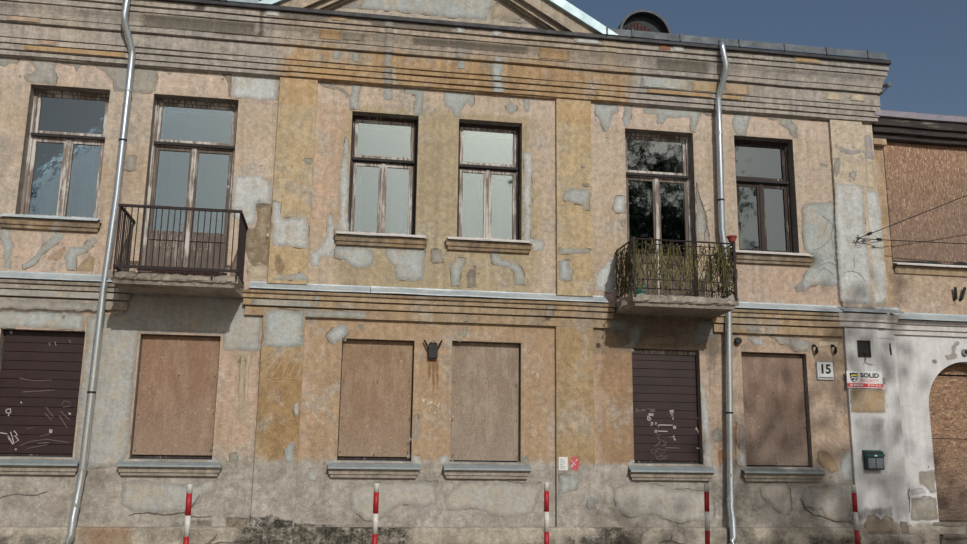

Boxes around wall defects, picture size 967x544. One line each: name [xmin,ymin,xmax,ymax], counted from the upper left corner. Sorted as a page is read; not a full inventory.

spalling [245,200,294,273]
crack [131,496,241,544]
damp [239,516,408,544]
damp [569,527,630,544]